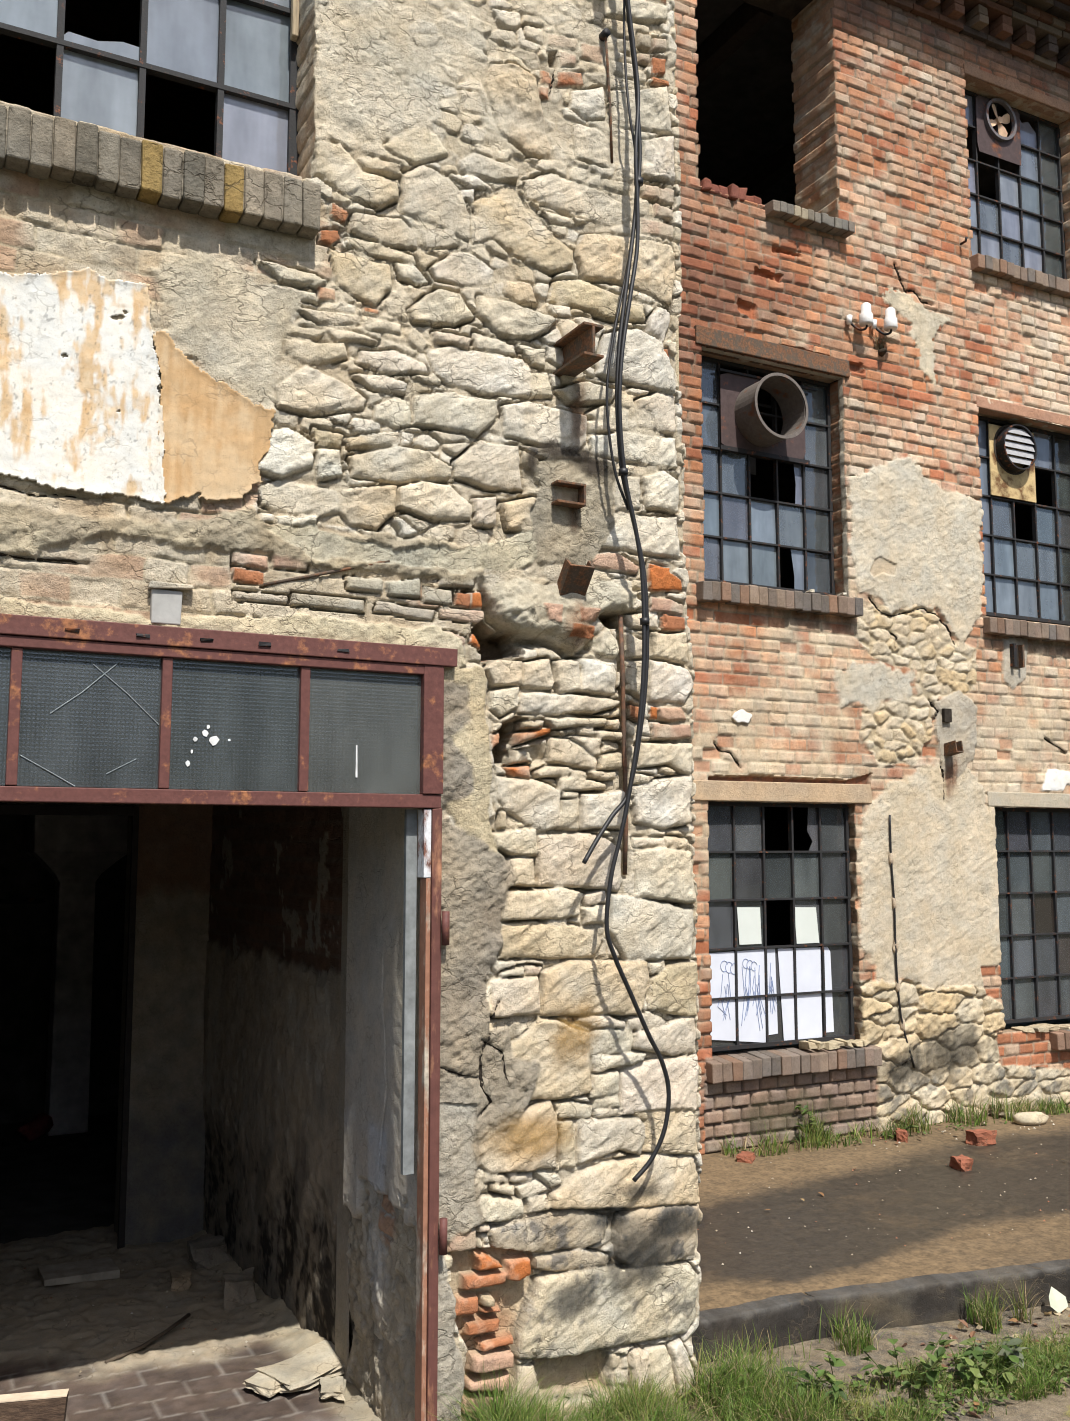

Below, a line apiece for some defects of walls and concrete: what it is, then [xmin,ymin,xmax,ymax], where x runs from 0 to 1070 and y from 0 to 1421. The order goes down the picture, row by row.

peeling [0,249,487,582]
peeling [848,456,985,642]
peeling [834,660,917,712]
crack [445,1001,509,1115]